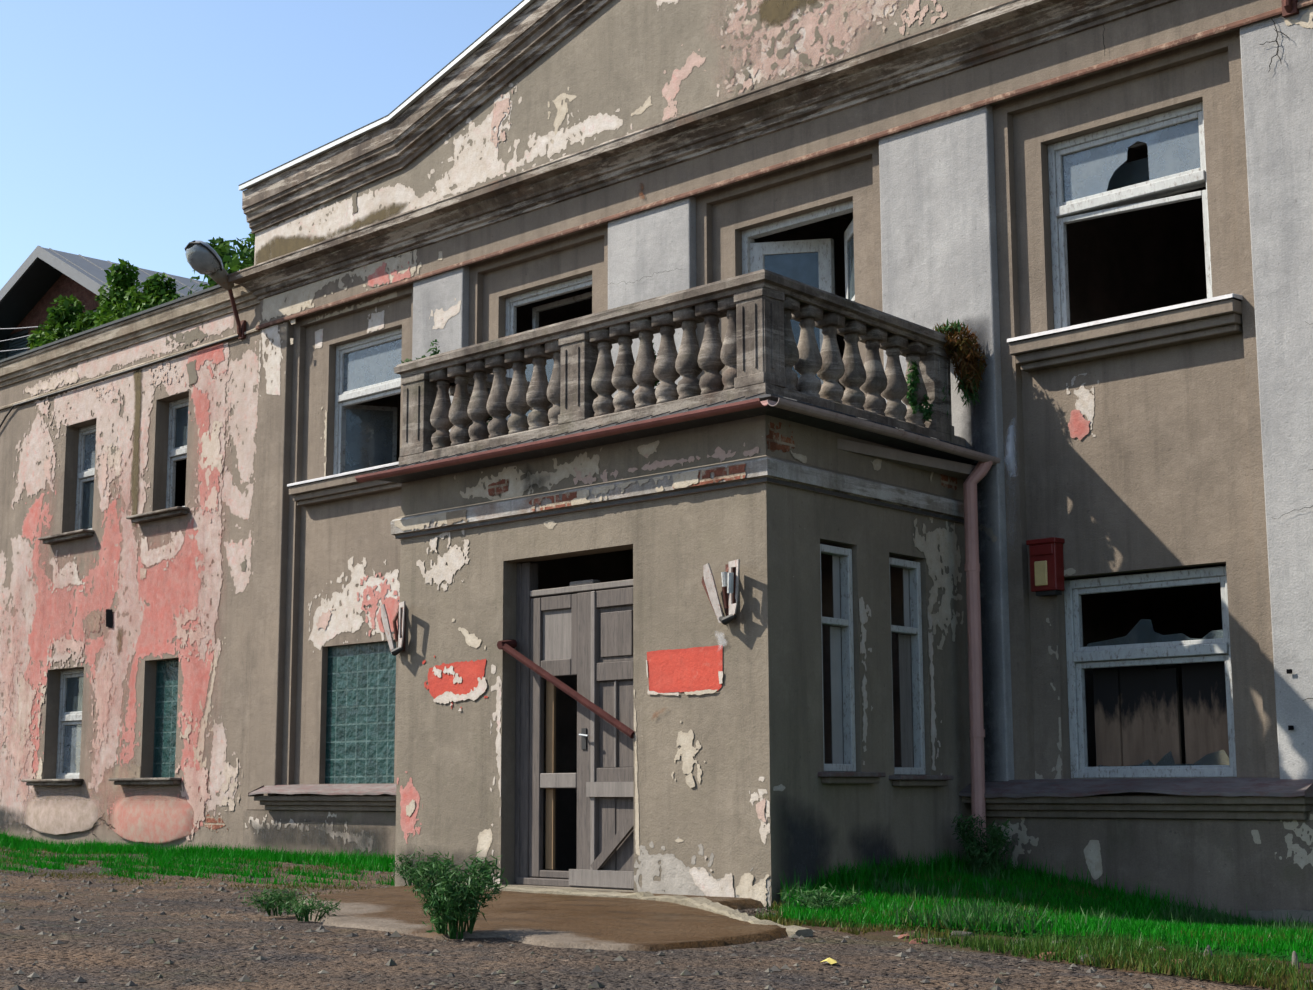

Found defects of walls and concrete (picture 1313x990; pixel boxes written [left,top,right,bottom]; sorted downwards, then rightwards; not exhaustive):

peeling [717,0,947,99]
peeling [254,44,706,265]
peeling [1066,373,1099,440]
peeling [0,249,423,844]
peeling [395,422,807,591]
peeling [913,517,964,775]
peeling [245,810,370,852]
flaking render [633,645,771,907]
peeling [1275,814,1313,869]